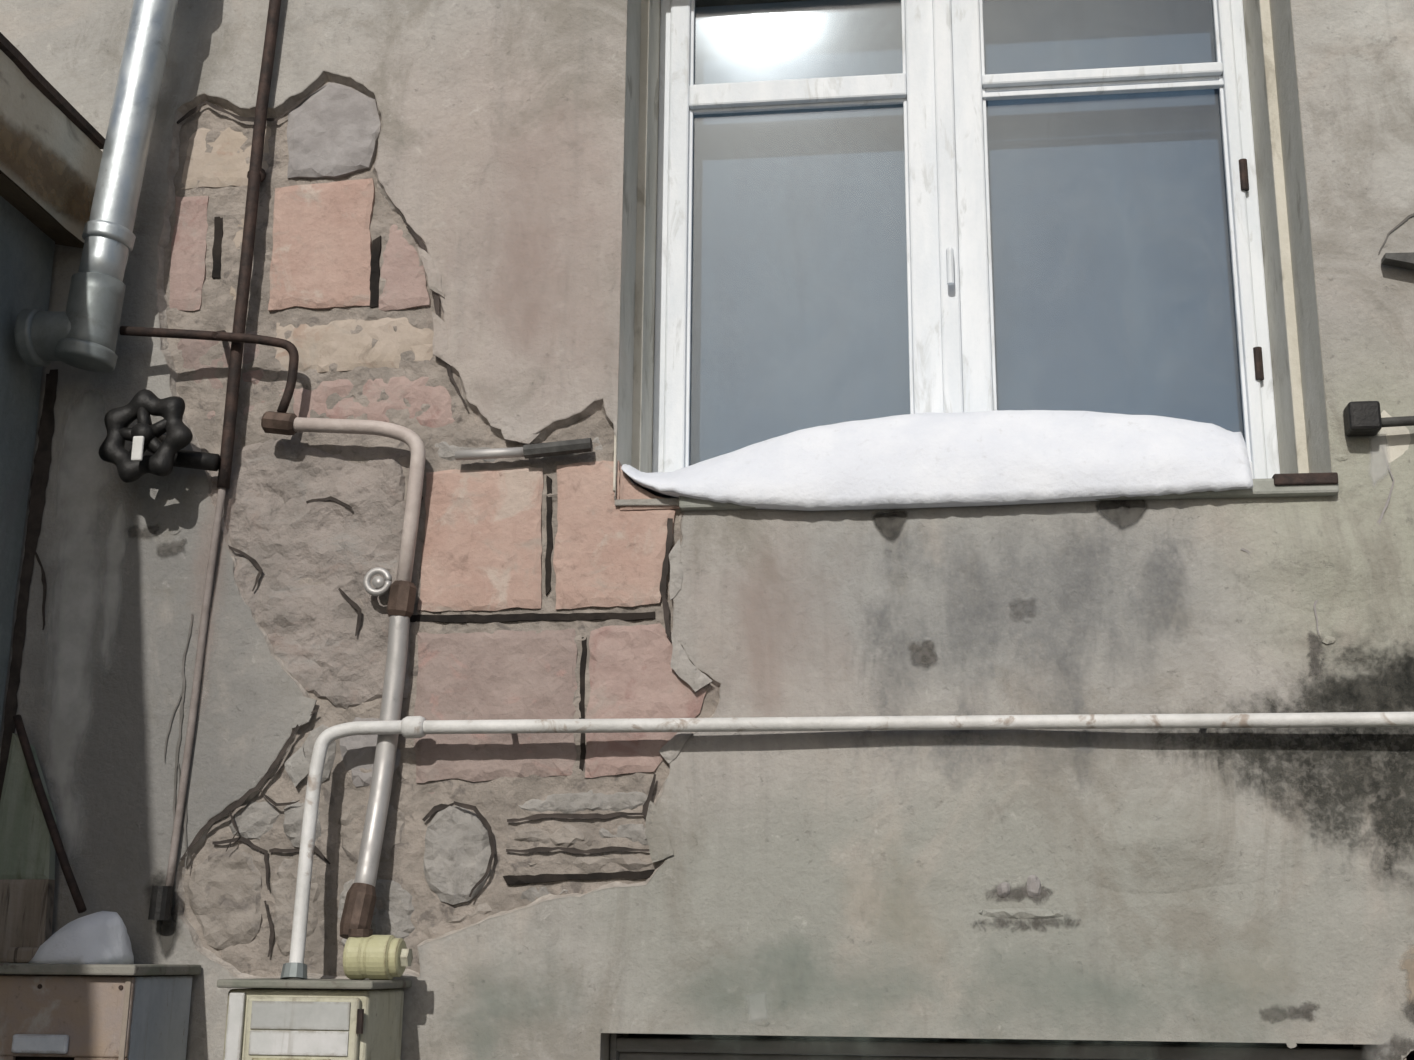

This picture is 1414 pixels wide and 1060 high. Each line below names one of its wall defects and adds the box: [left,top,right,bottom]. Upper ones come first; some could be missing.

water stain [49,393,125,852]
spalling [155,70,721,979]
water stain [1228,648,1414,874]
spalling [1379,1035,1414,1060]
spalling [1401,937,1414,1021]